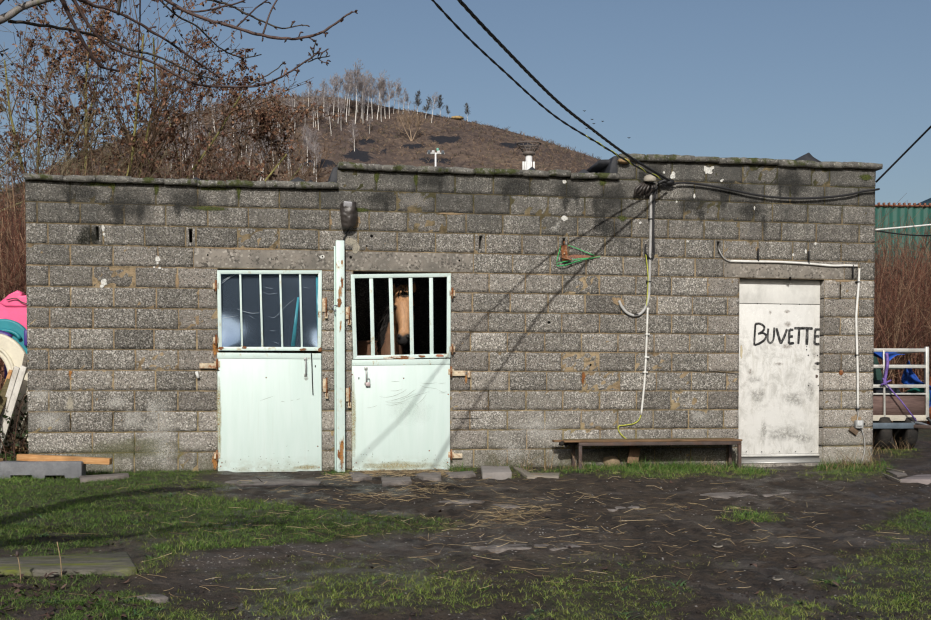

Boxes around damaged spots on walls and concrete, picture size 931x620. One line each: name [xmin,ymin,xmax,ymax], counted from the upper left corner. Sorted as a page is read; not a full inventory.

leakage [77,227,97,243]